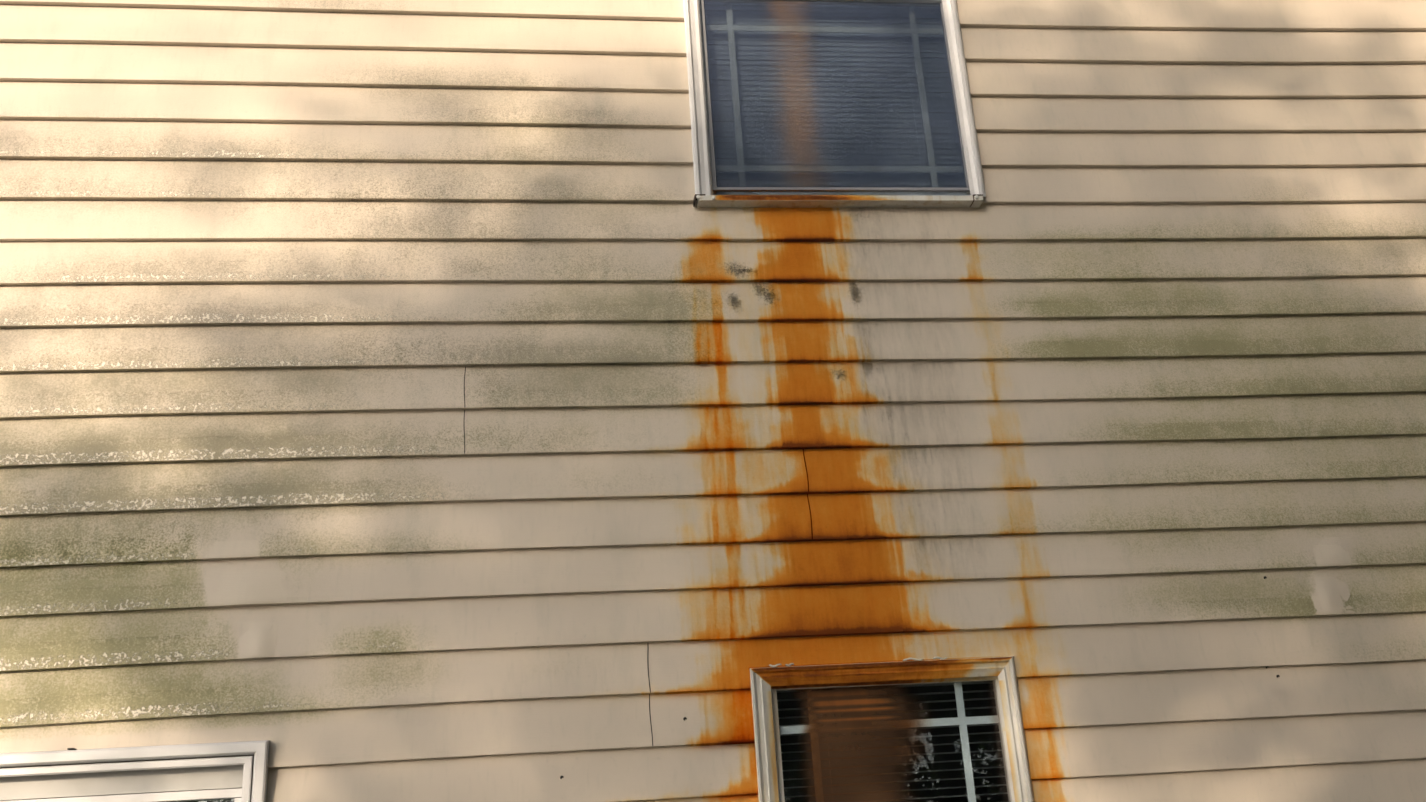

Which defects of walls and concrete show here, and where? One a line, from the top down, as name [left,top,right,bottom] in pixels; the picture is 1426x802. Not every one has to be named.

rust [776,234,843,255]
rust [770,395,834,406]
rust [767,436,874,450]
rust [768,485,887,495]
rust [750,520,909,588]
rust [748,608,928,639]
rust [700,735,755,746]
rust [723,659,962,802]